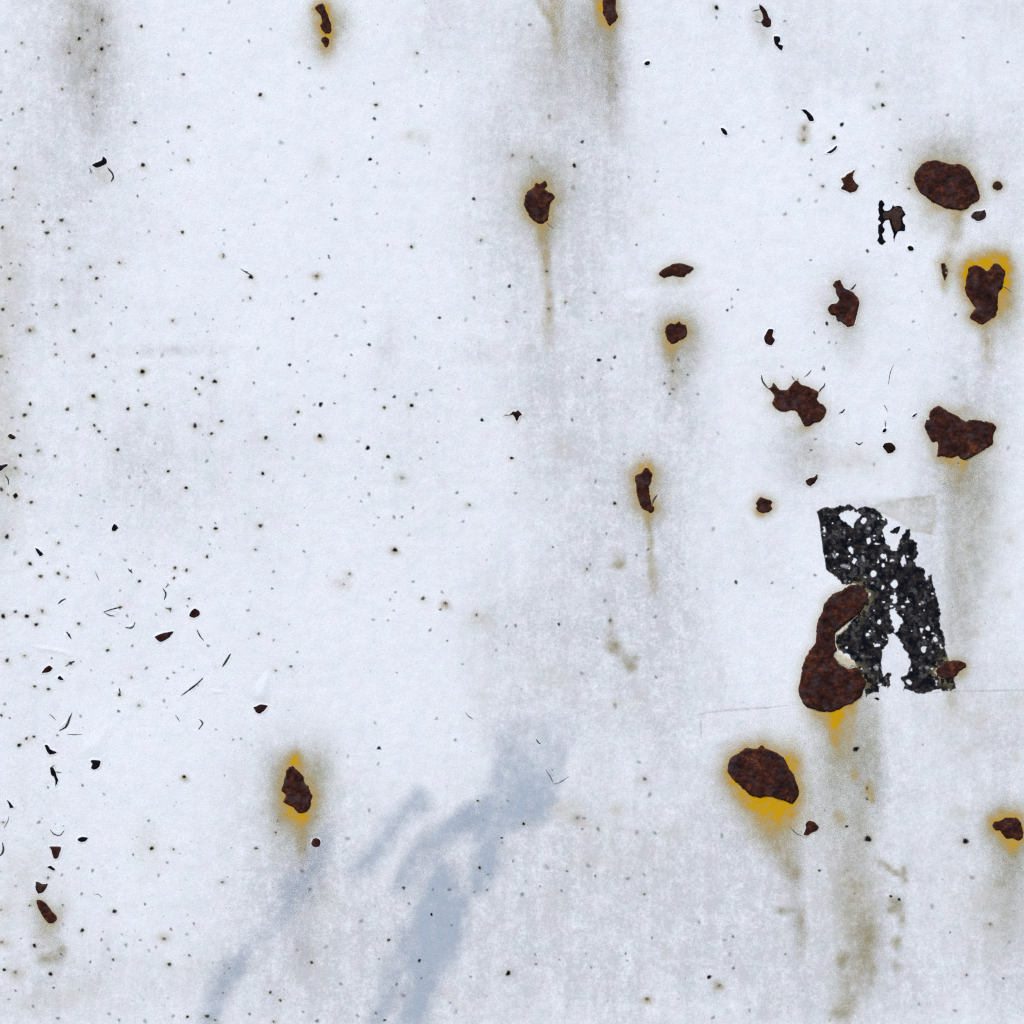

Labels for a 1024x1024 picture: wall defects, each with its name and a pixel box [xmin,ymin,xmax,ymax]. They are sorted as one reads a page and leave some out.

corrosion [522,169,555,272]
corrosion [896,152,980,217]
corrosion [659,263,694,278]
corrosion [826,278,861,329]
corrosion [958,249,1015,326]
corrosion [761,375,826,428]
corrosion [924,406,996,472]
corrosion [631,462,658,541]
corrosion [798,584,869,751]
corrosion [275,751,323,835]
corrosion [722,741,804,852]
corrosion [988,810,1024,855]